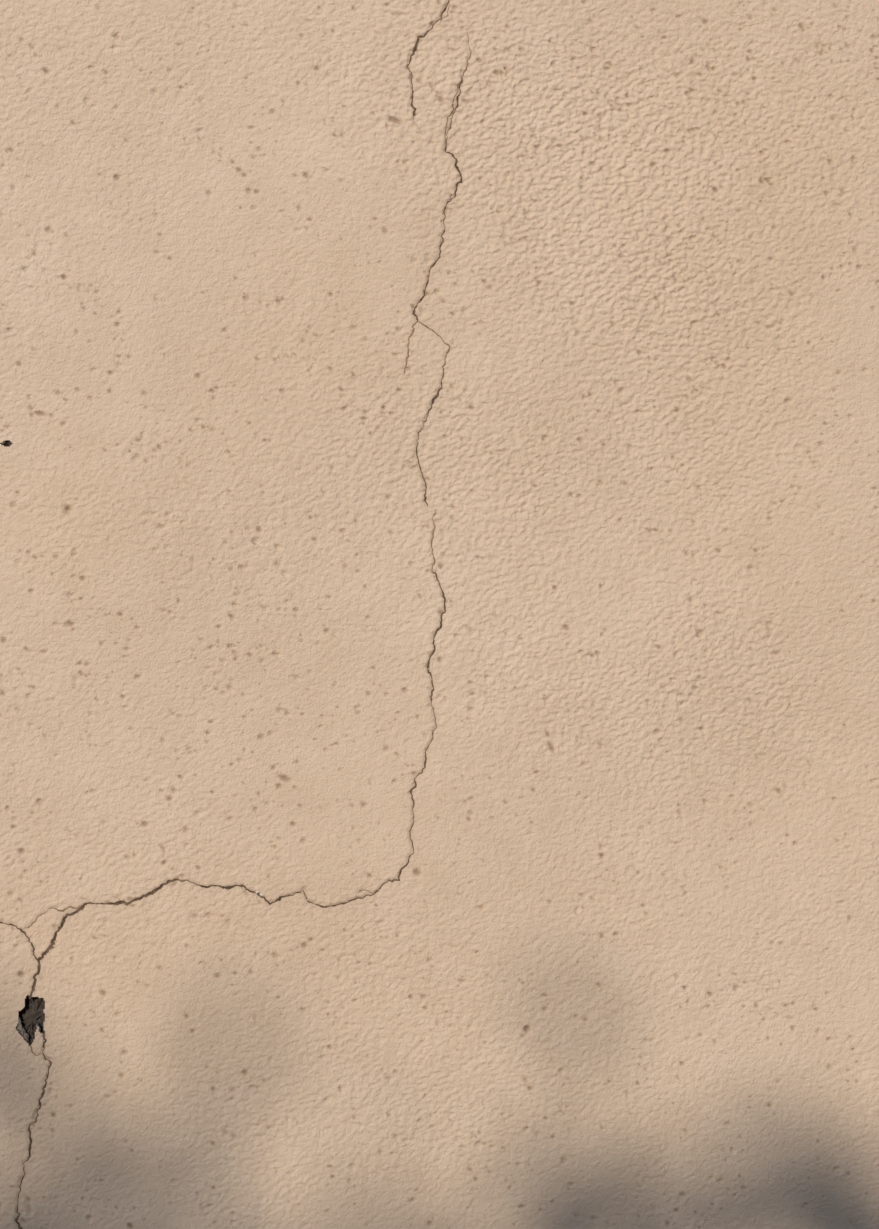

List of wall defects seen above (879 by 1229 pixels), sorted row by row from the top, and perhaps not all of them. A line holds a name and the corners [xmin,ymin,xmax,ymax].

crack [407,0,450,118]
crack [0,36,472,999]
spalling [16,995,45,1046]
crack [15,1034,52,1229]